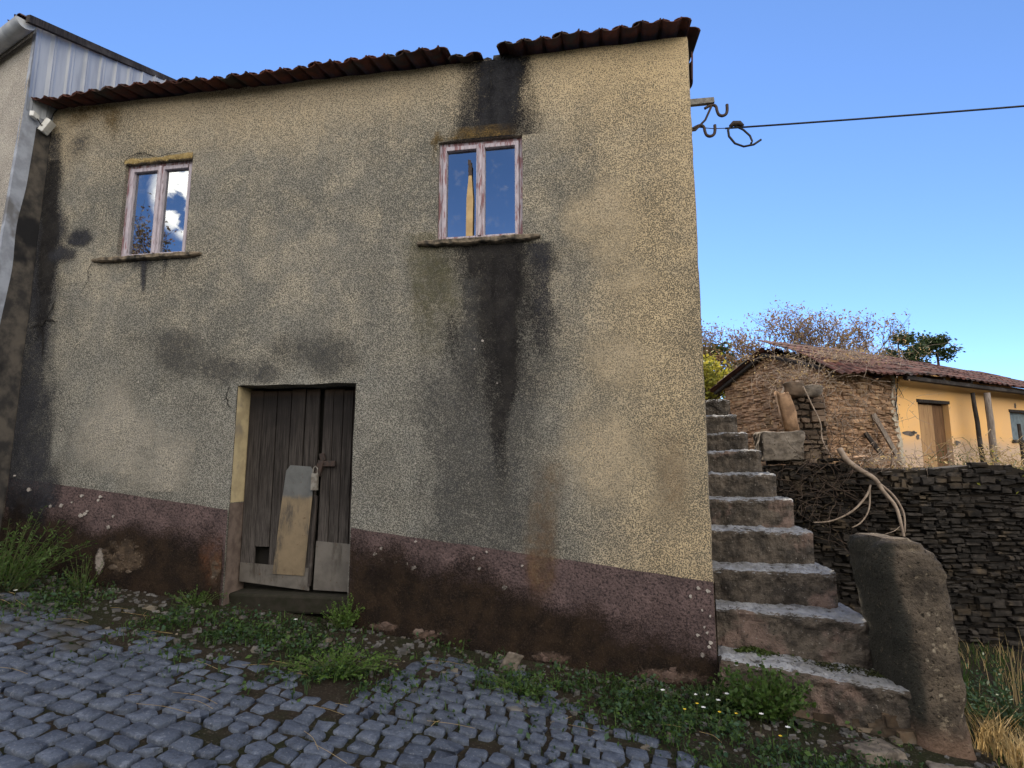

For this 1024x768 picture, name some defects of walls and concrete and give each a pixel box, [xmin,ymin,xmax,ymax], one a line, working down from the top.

water stain [487,56,525,137]
water stain [569,184,629,262]
water stain [0,133,223,606]
water stain [348,241,718,691]
flaking render [95,515,143,574]